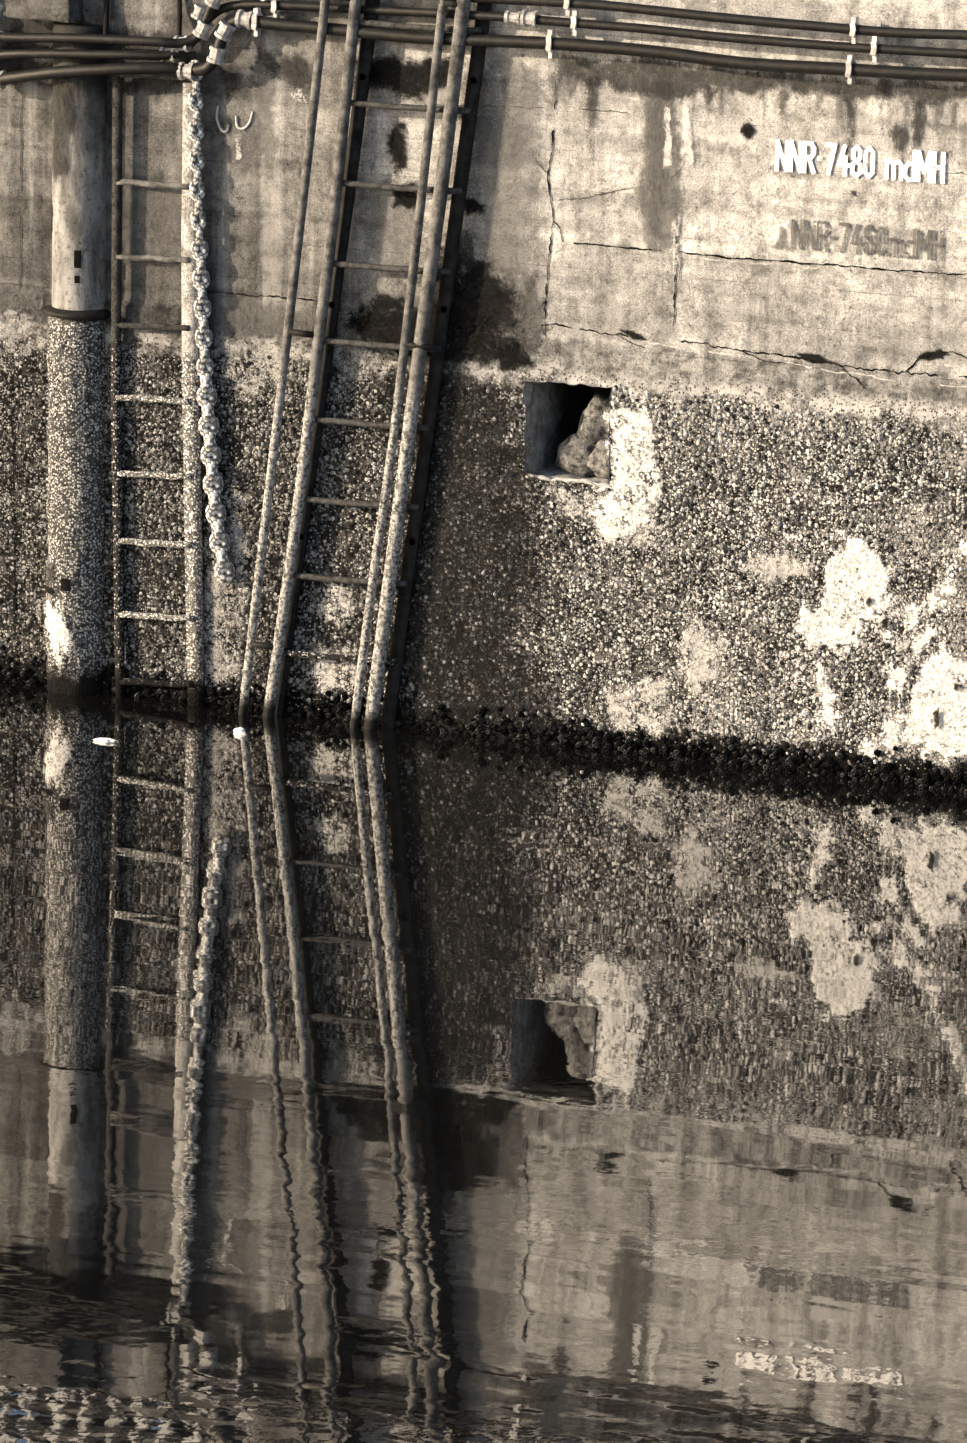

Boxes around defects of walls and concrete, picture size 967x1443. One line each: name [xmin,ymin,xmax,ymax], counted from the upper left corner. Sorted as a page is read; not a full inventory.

crack [426,90,967,387]
leakage [547,52,967,267]